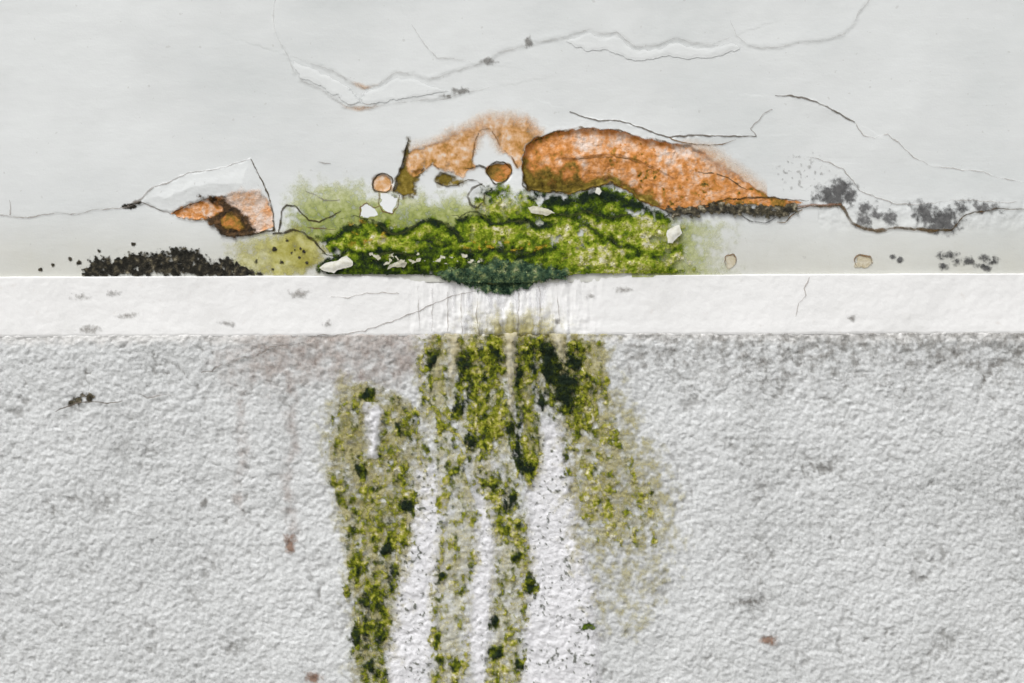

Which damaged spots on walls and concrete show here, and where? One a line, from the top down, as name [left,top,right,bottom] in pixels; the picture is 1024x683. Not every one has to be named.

peeling [567,33,740,61]
peeling [293,61,468,104]
crack [570,95,865,146]
crack [0,200,125,218]
flaking render [122,159,275,239]
leakage [811,178,897,227]
crack [788,158,1015,233]
leakage [909,201,997,234]
leakage [68,242,263,276]
leakage [385,459,447,683]
leakage [464,452,498,683]
leakage [518,422,600,683]